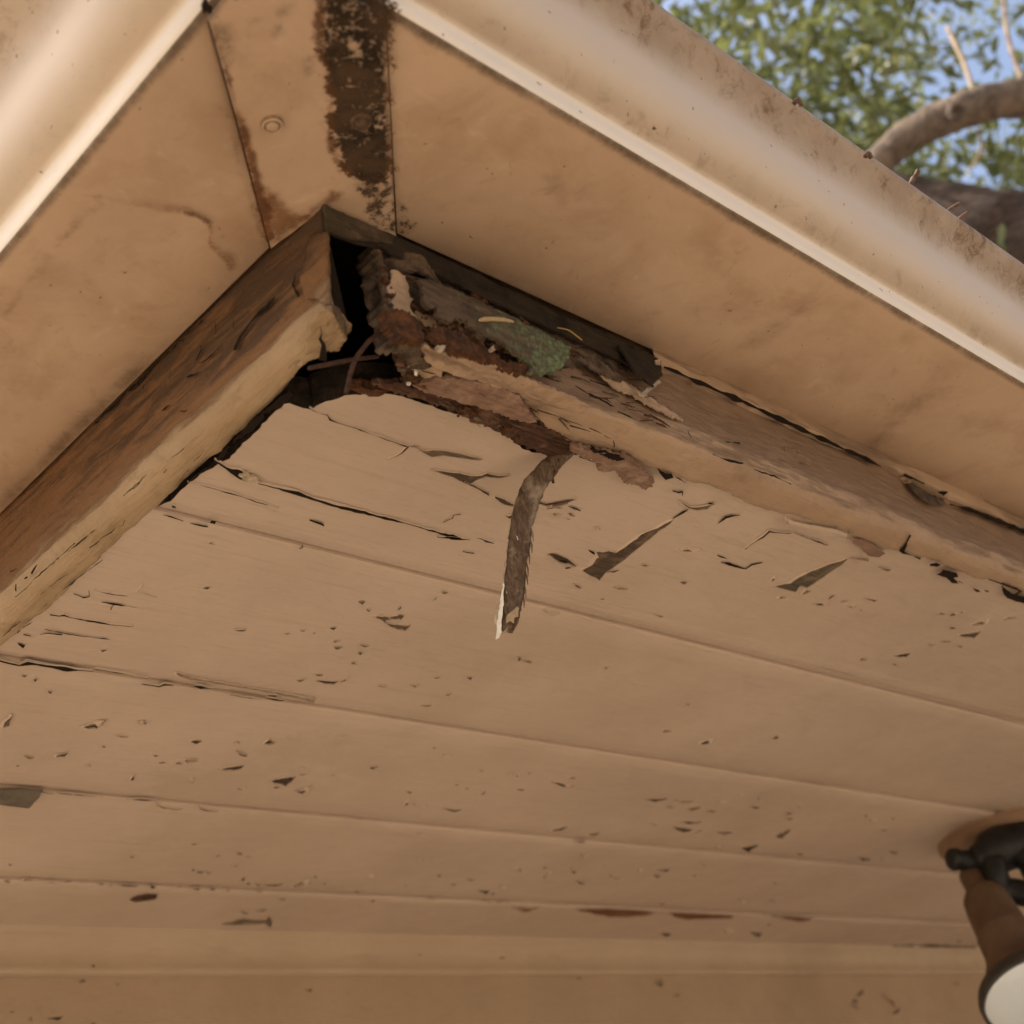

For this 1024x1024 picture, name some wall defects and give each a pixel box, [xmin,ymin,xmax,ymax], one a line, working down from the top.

water stain [313,0,417,233]
peeling [300,230,347,356]
peeling [383,252,494,345]
peeling [403,342,591,414]
crack [542,375,632,418]
peeling [600,376,683,422]
peeling [411,446,514,519]
crack [657,366,1024,534]
peeling [547,517,674,589]
peeling [769,516,891,611]
peeling [930,563,959,584]
peeling [1002,586,1024,603]